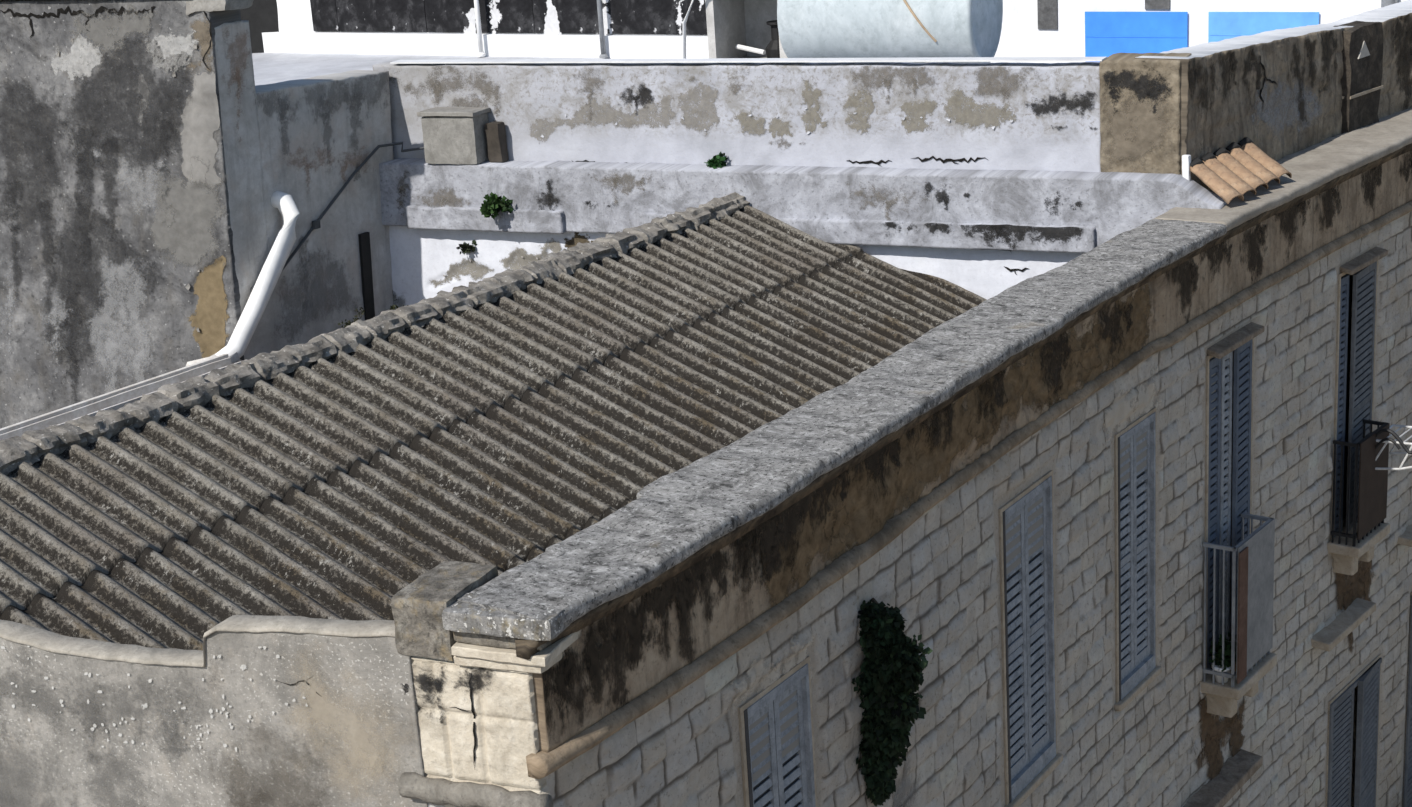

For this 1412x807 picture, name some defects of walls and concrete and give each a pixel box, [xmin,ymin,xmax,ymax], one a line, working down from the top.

crack [0,6,155,37]
peeling [530,80,827,142]
peeling [843,90,875,135]
peeling [900,89,1017,133]
crack [847,156,988,167]
leakage [0,39,190,401]
flaking render [151,174,230,358]
leakage [542,403,954,736]
crack [449,670,477,768]